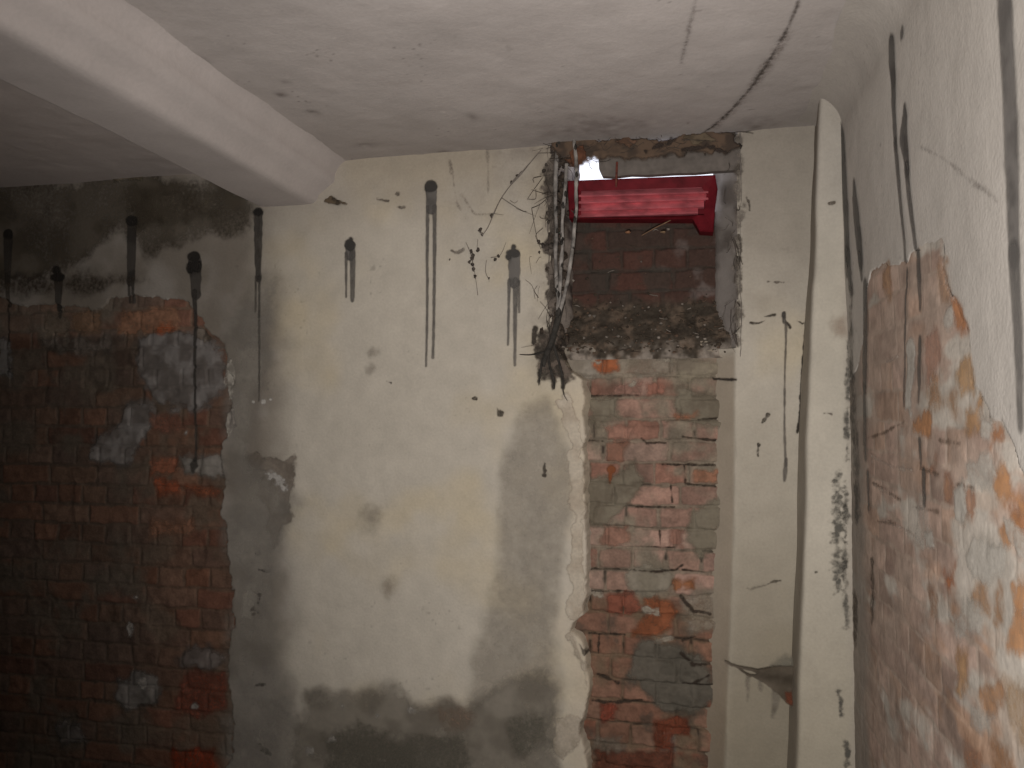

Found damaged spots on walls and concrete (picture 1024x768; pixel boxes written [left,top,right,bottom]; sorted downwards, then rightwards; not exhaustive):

flaking render [0,294,236,768]
damp [0,176,568,768]
flaking render [553,341,721,768]
flaking render [551,132,740,166]
crack [753,5,798,85]
damp [832,125,869,645]
damp [889,27,921,406]
damp [918,438,926,507]
flaking render [850,238,1024,768]
damp [998,0,1022,431]